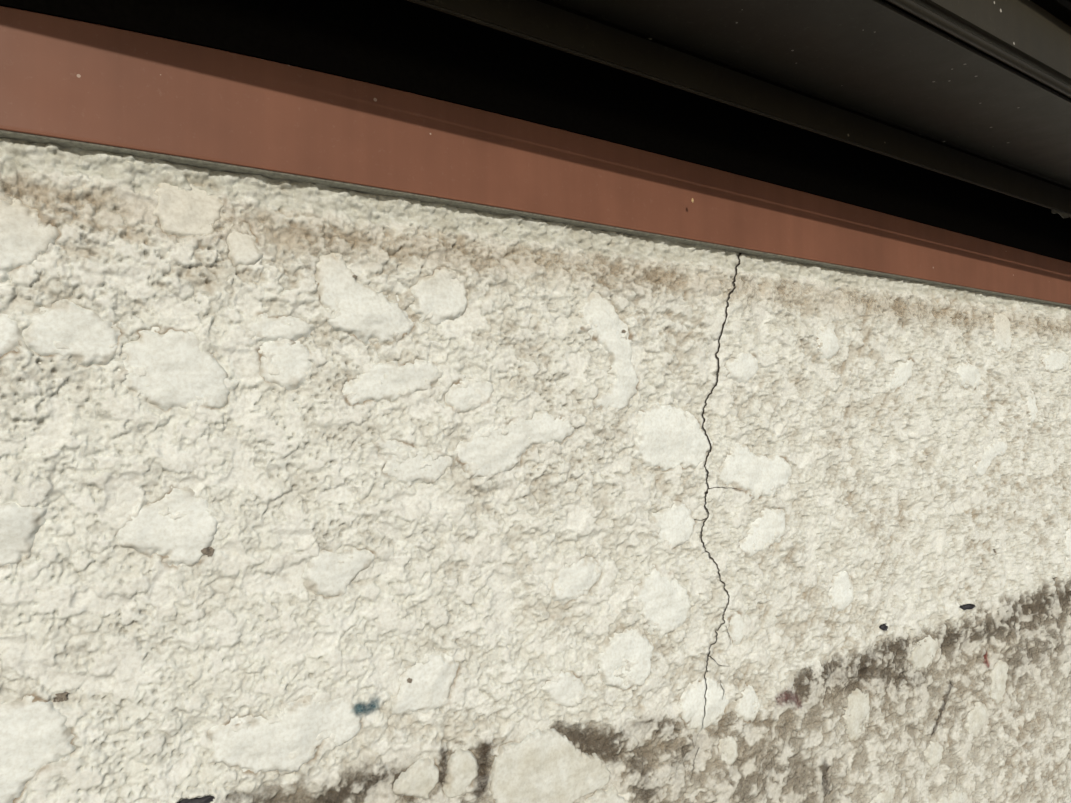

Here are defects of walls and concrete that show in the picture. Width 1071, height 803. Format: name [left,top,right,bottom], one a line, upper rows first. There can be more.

crack [693,253,742,767]